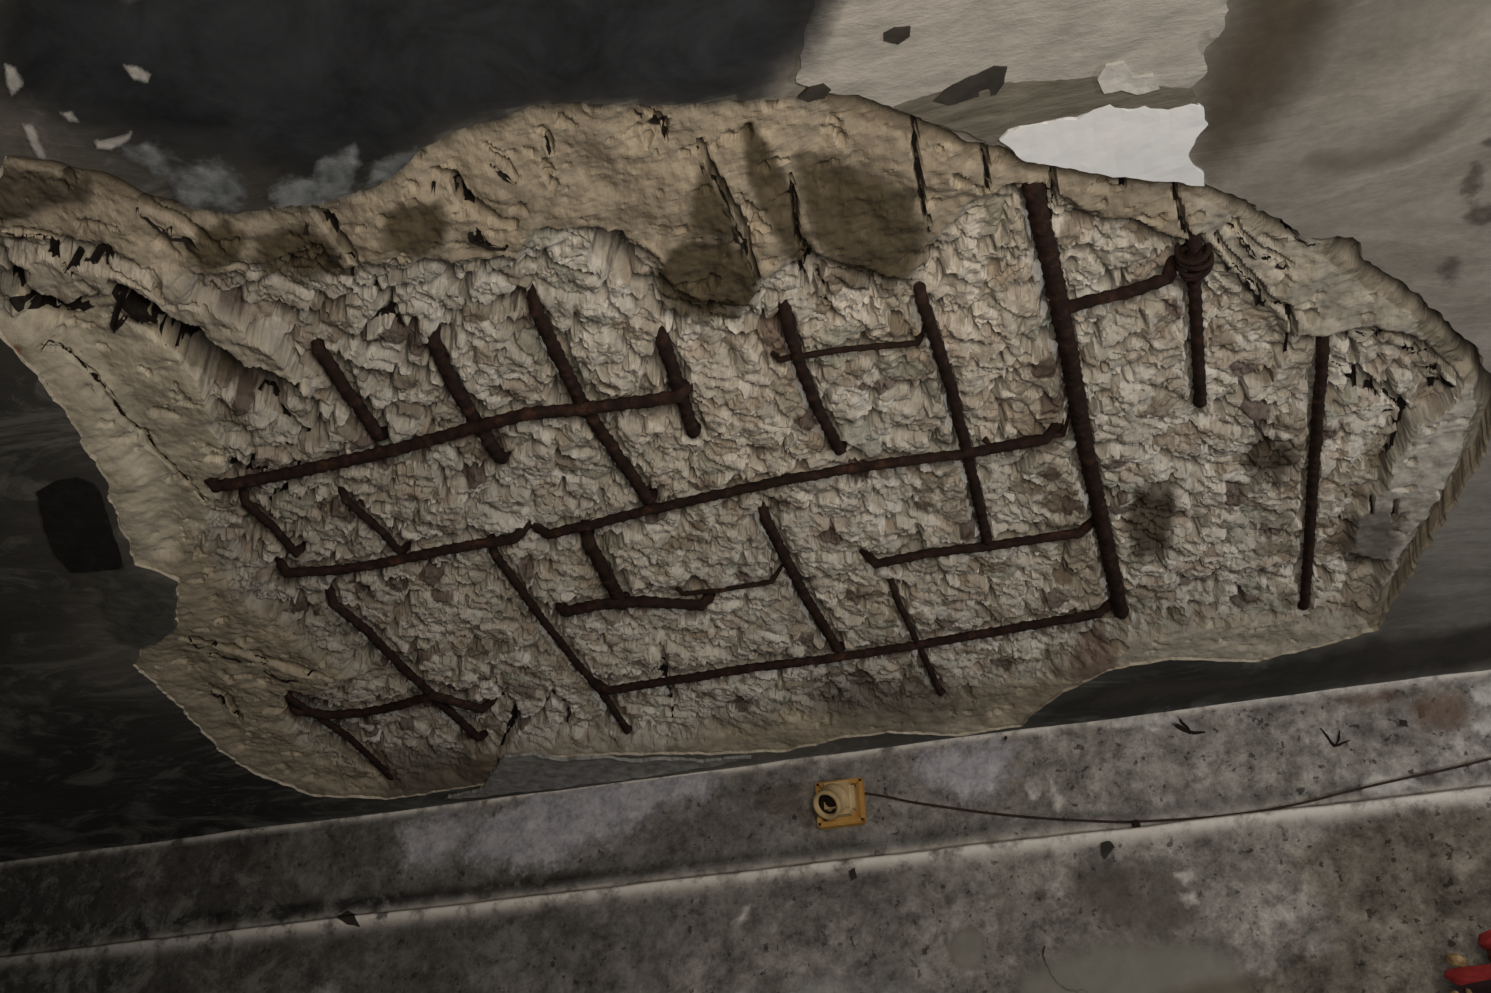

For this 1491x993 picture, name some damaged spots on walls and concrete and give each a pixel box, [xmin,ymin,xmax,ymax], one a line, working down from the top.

peeling [6,65,23,94]
peeling [126,66,150,82]
peeling [796,0,1229,144]
rust [384,205,446,255]
rust [761,308,787,353]
spalling [0,83,1491,800]
rust [1247,434,1292,483]
rust [1125,480,1176,555]
peeling [1025,775,1065,810]